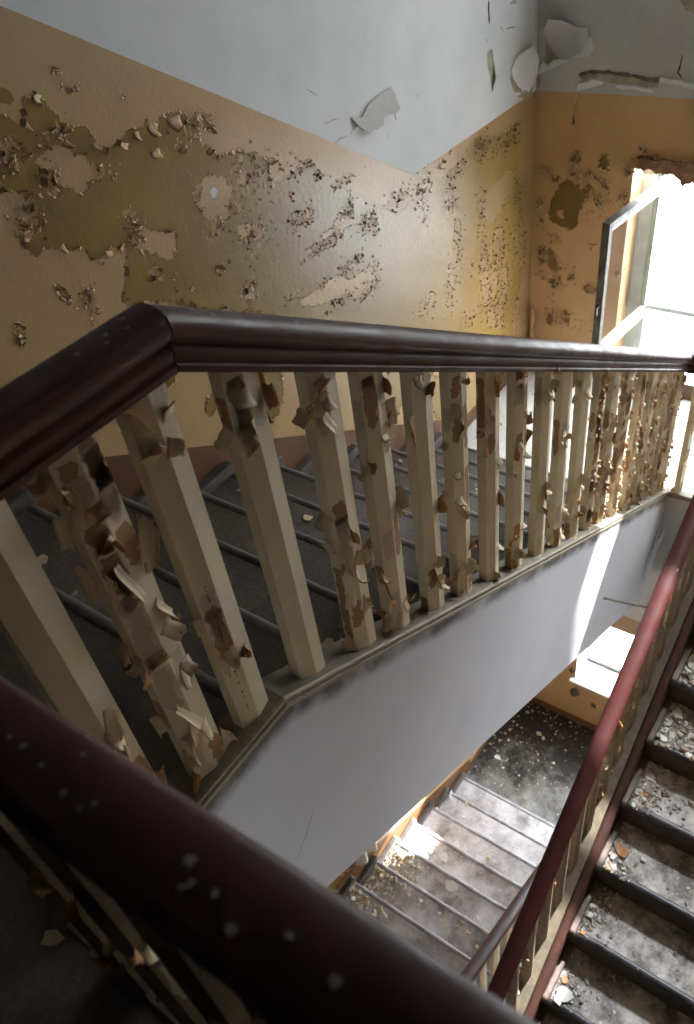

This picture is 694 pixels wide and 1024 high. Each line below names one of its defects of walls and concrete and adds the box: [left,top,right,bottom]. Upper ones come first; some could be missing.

peeling [487,19,694,99]
peeling [0,87,694,339]
peeling [204,372,285,440]
peeling [352,372,402,430]
peeling [430,372,513,479]
peeling [515,373,551,451]
peeling [535,372,684,556]
peeling [55,436,144,622]
peeling [200,588,233,655]
peeling [332,500,363,639]
peeling [420,554,442,611]
peeling [496,507,520,568]